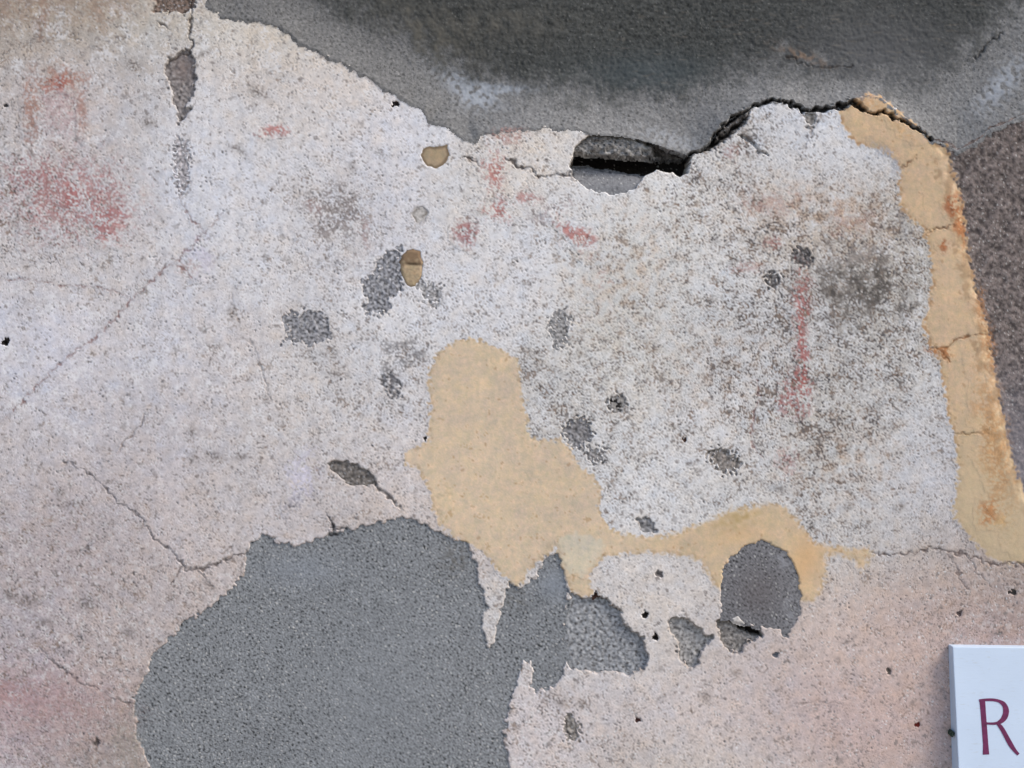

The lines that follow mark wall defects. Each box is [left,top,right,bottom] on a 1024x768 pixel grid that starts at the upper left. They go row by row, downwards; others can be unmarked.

spalling [165,49,198,196]
crack [682,97,934,167]
spalling [570,135,686,195]
crack [178,193,224,232]
crack [924,224,951,235]
crack [0,262,178,424]
crack [116,411,150,454]
spalling [561,414,611,466]
spalling [329,460,375,486]
crack [58,459,249,589]
spalling [557,592,648,675]
spalling [669,616,762,667]